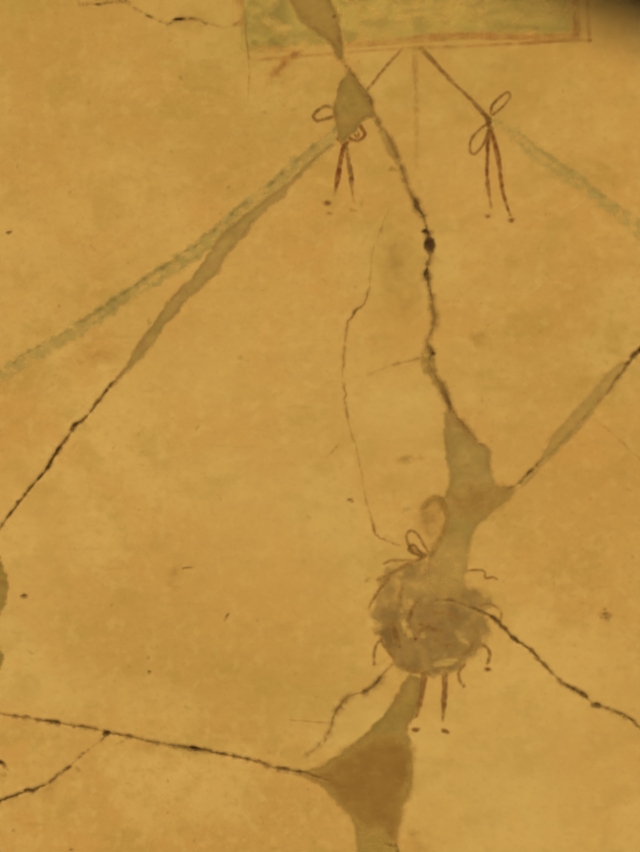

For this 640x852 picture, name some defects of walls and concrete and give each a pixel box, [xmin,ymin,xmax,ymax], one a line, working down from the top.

crack [146,15,205,23]
crack [338,56,485,446]
crack [607,346,640,394]
crack [0,379,117,529]
crack [509,464,540,489]
crack [431,600,640,727]
crack [1,665,392,781]
crack [0,752,85,803]
water stain [310,736,413,840]